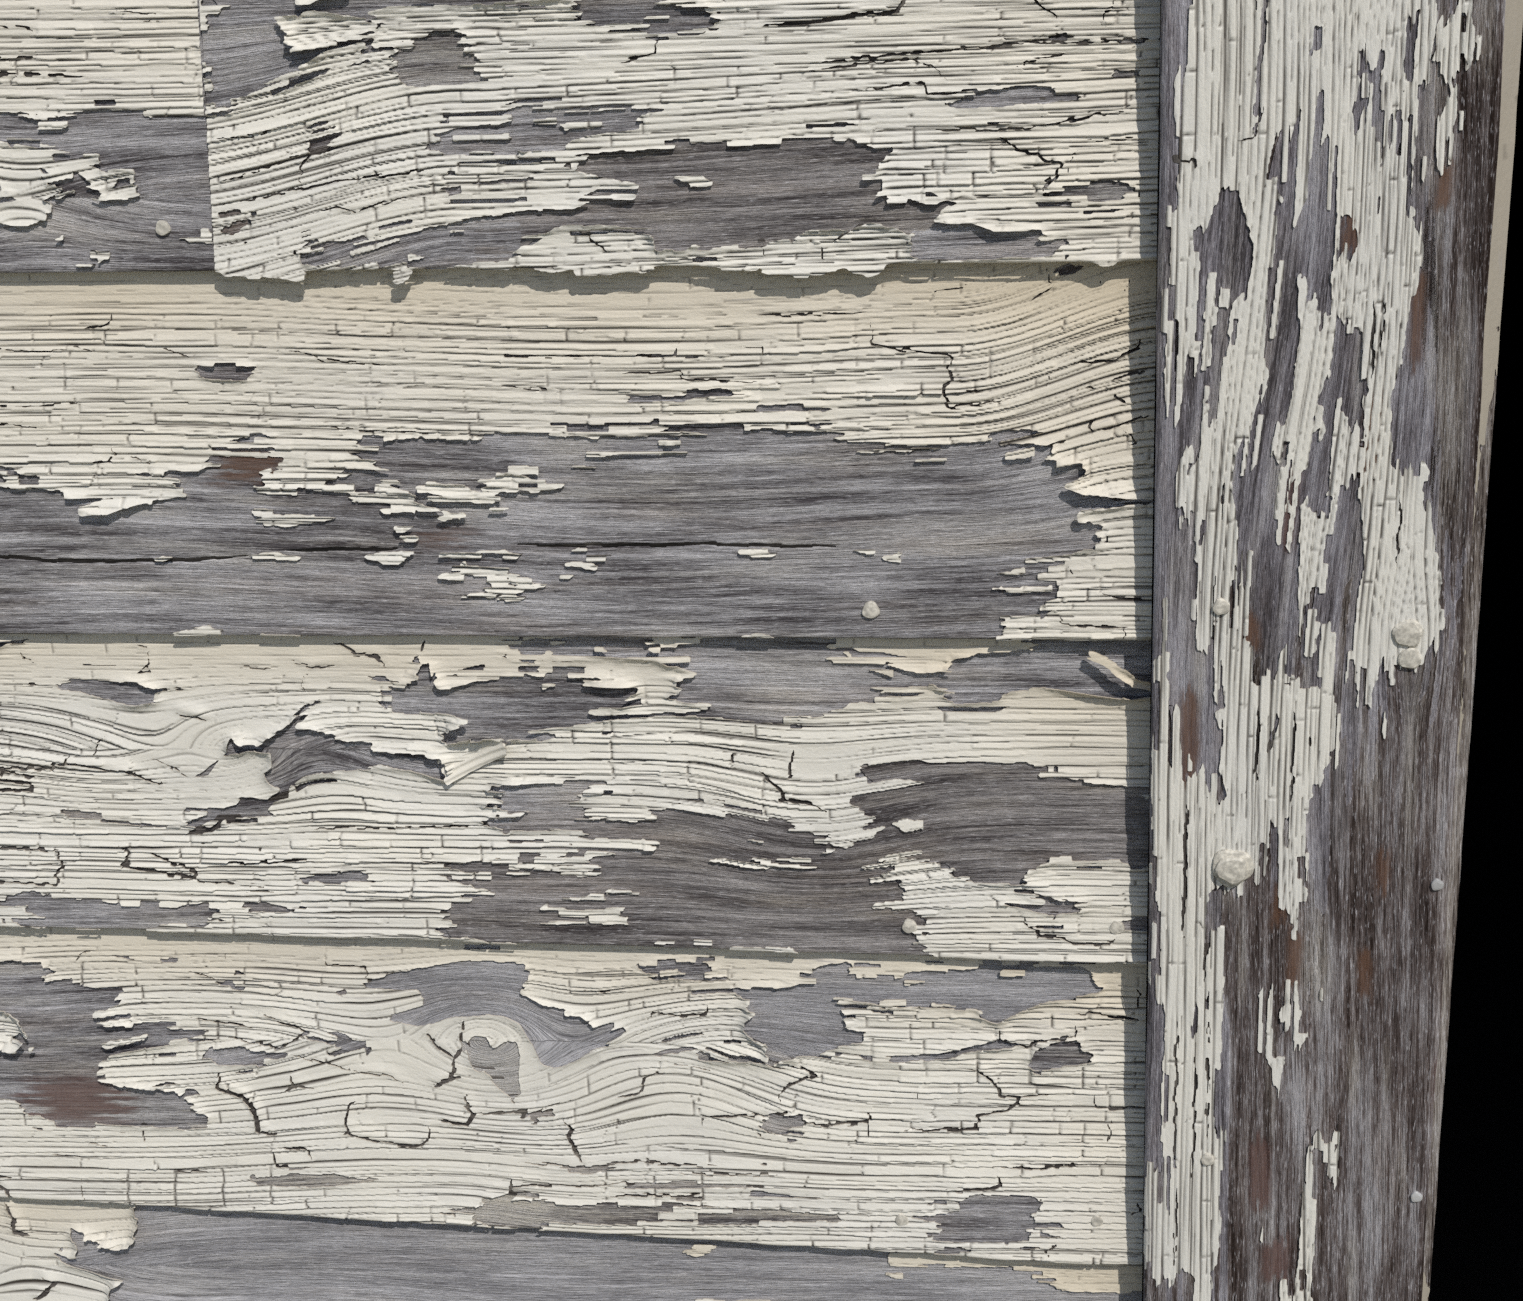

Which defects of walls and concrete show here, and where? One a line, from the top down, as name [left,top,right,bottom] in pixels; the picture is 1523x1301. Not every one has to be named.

crack [763,0,906,26]
crack [822,0,1149,203]
crack [1172,155,1197,168]
crack [1238,102,1264,141]
peeling [0,0,1254,1212]
peeling [1204,0,1506,1301]
crack [0,846,66,886]
crack [326,963,372,983]
crack [651,1005,709,1018]
crack [197,1014,774,1198]
crack [702,1051,872,1136]
peeling [55,1175,1201,1301]